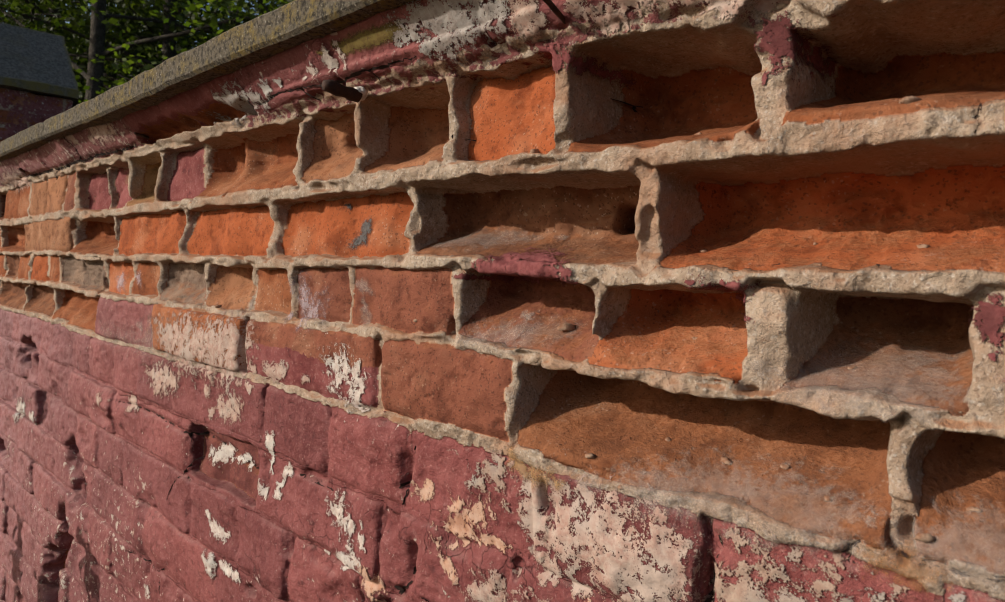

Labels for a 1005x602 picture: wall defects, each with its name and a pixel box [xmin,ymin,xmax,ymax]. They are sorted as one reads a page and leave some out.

spalling [66,73,282,155]
peeling [303,39,347,84]
crack [256,56,416,105]
spalling [382,0,790,161]
spalling [655,165,1005,273]
spalling [0,106,910,602]
spalling [783,297,974,416]
spalling [914,430,1005,574]
peeling [948,591,966,602]